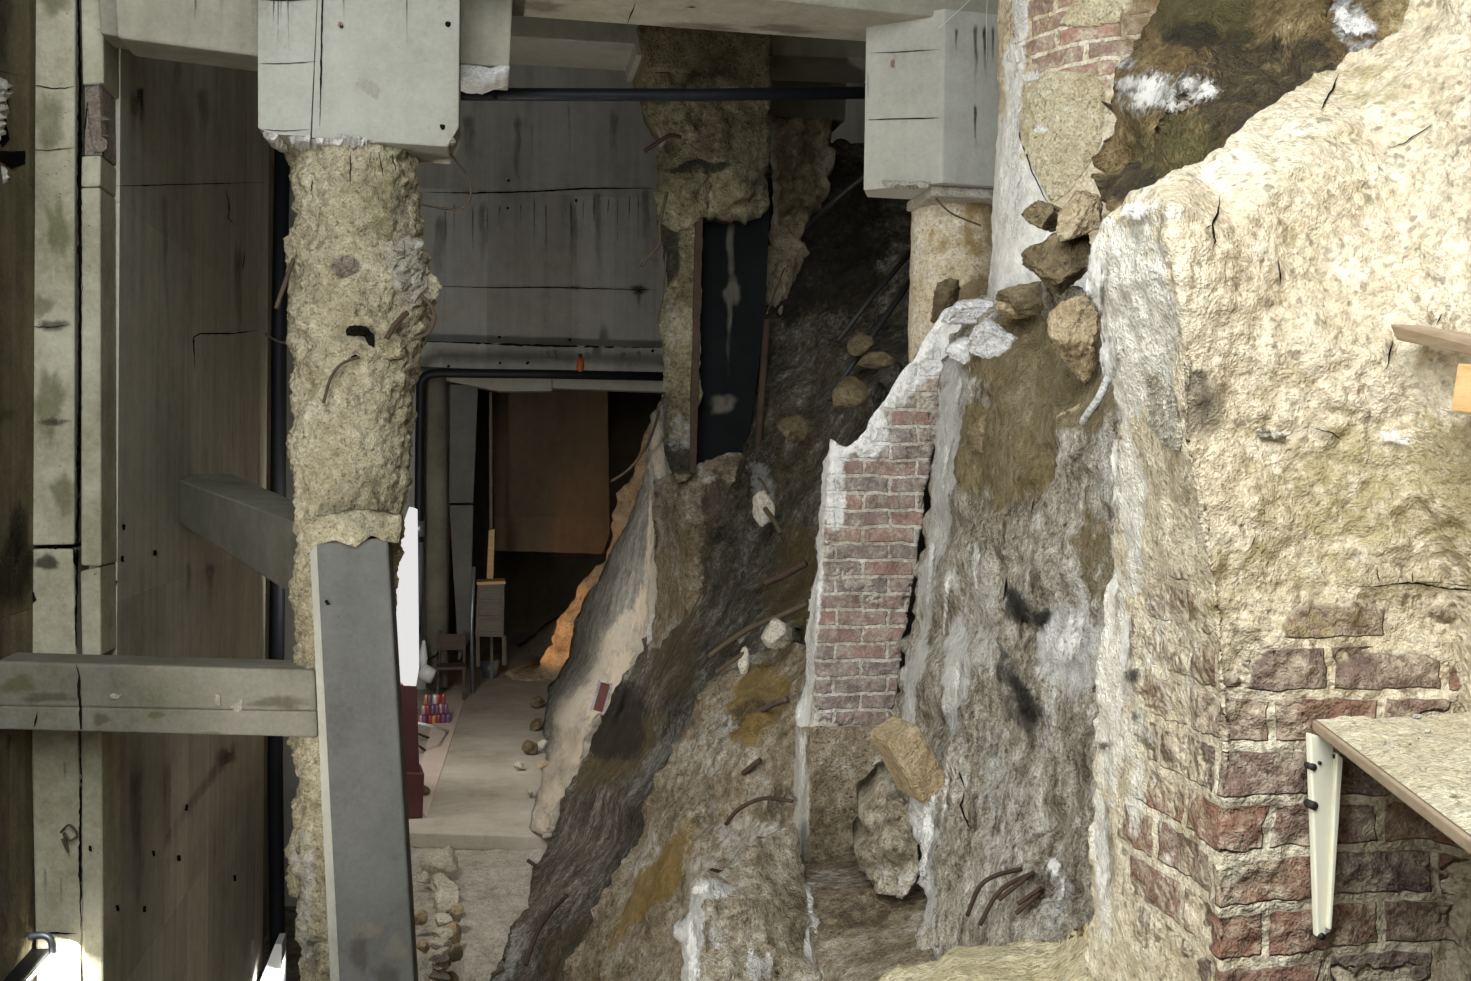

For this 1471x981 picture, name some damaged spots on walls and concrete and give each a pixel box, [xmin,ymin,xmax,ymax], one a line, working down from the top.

spalling [262,132,375,151]
spalling [317,255,358,276]
spalling [346,325,375,358]
crack [1339,571,1471,591]